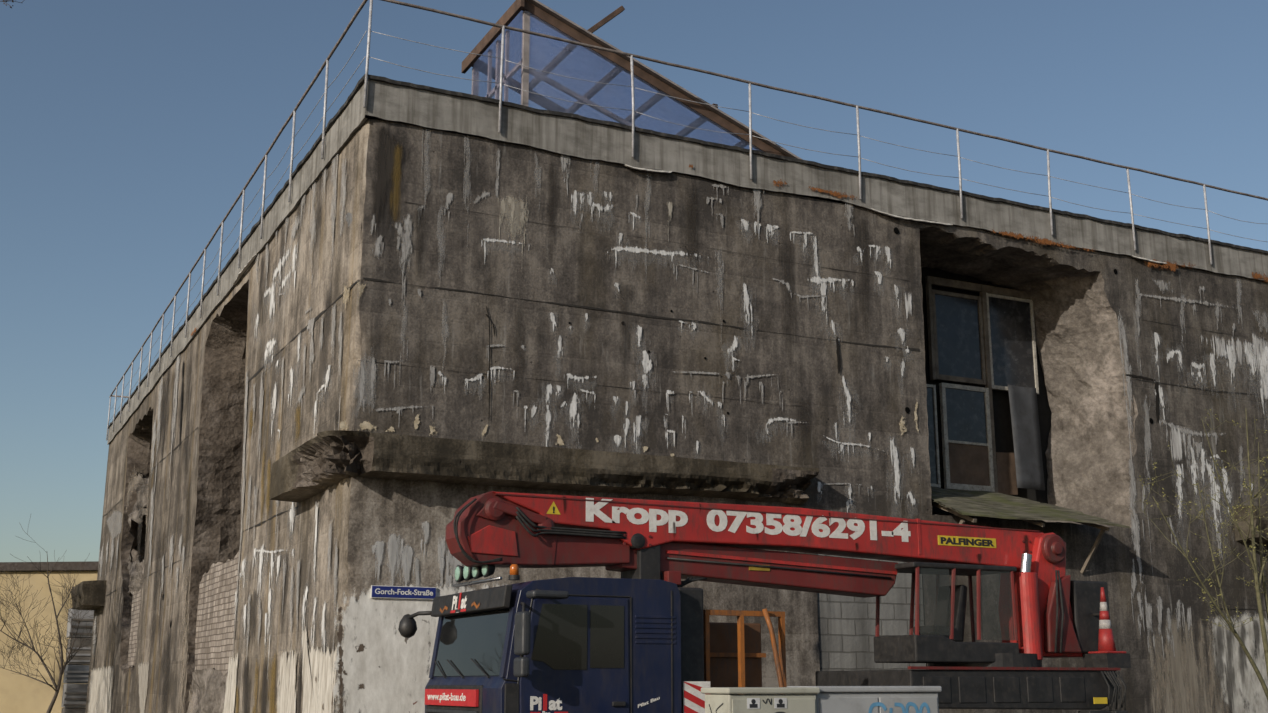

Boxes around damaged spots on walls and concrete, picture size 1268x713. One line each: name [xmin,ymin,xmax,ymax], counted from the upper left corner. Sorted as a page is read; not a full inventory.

damp [561,154,613,222]
damp [607,195,708,284]
damp [706,184,729,228]
damp [741,189,854,340]
damp [844,202,912,376]
damp [1118,279,1268,713]